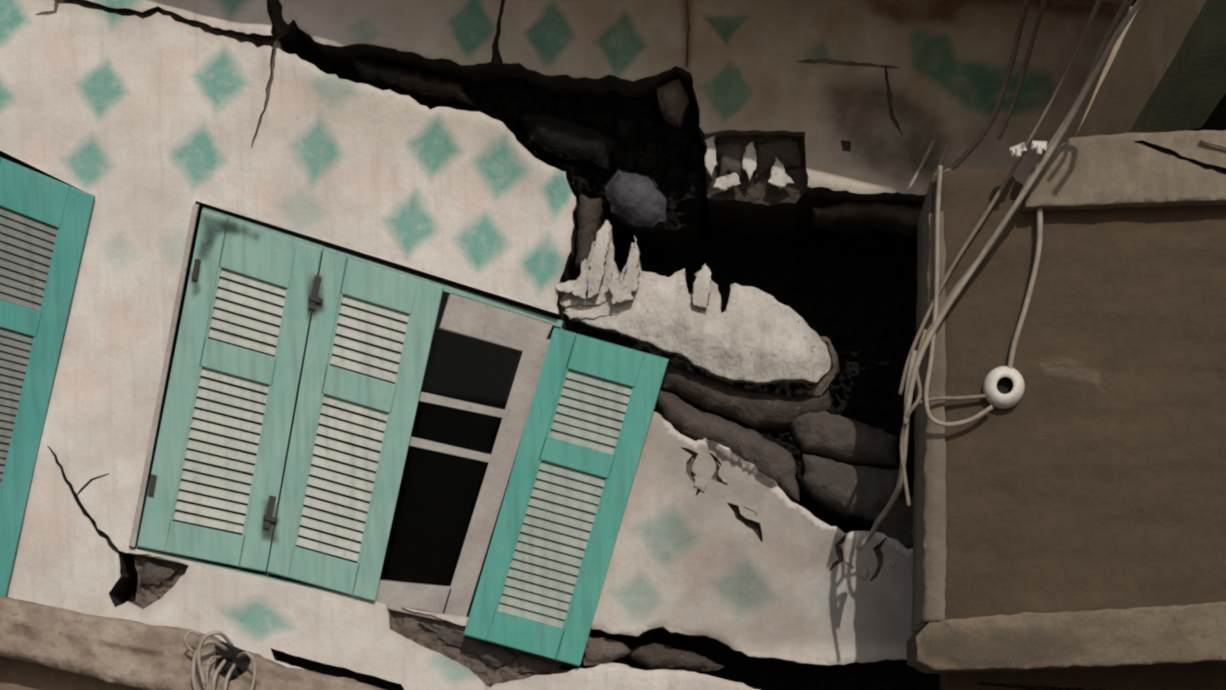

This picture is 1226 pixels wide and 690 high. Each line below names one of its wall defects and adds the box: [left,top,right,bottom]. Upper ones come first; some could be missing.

crack [36,0,707,275]
spalling [705,130,808,205]
crack [797,58,903,136]
damp [834,89,942,172]
crack [1134,140,1226,175]
peeling [556,219,839,397]
crack [48,446,119,554]
peeling [681,438,728,496]
peeling [727,503,763,542]
peeling [829,534,896,581]
spalling [386,606,571,687]
crack [977,682,1104,690]